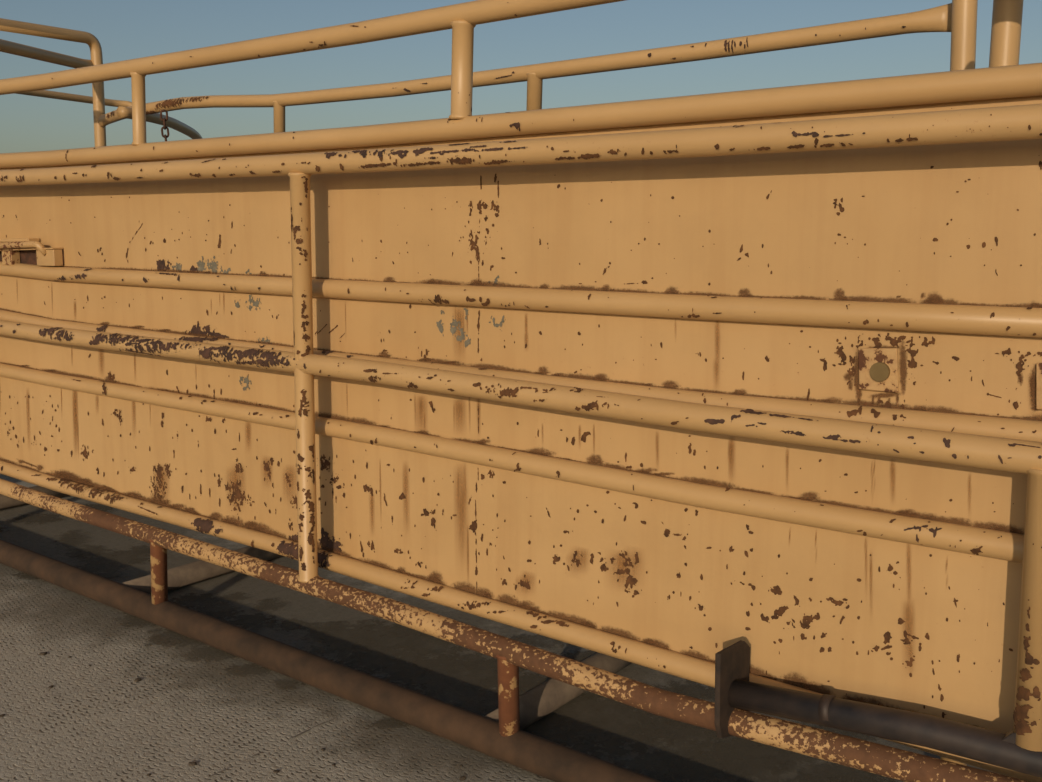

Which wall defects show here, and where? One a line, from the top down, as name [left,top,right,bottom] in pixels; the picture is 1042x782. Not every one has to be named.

peeling [272,141,527,173]
corrosion [291,176,308,265]
peeling [445,174,505,283]
peeling [88,309,305,375]
corrosion [0,290,1042,421]
corrosion [2,363,439,445]
peeling [149,415,298,541]
corrosion [454,439,1024,534]
corrosion [0,444,669,668]
peeling [552,504,647,598]
peeling [731,571,862,654]
corrosion [750,666,897,709]